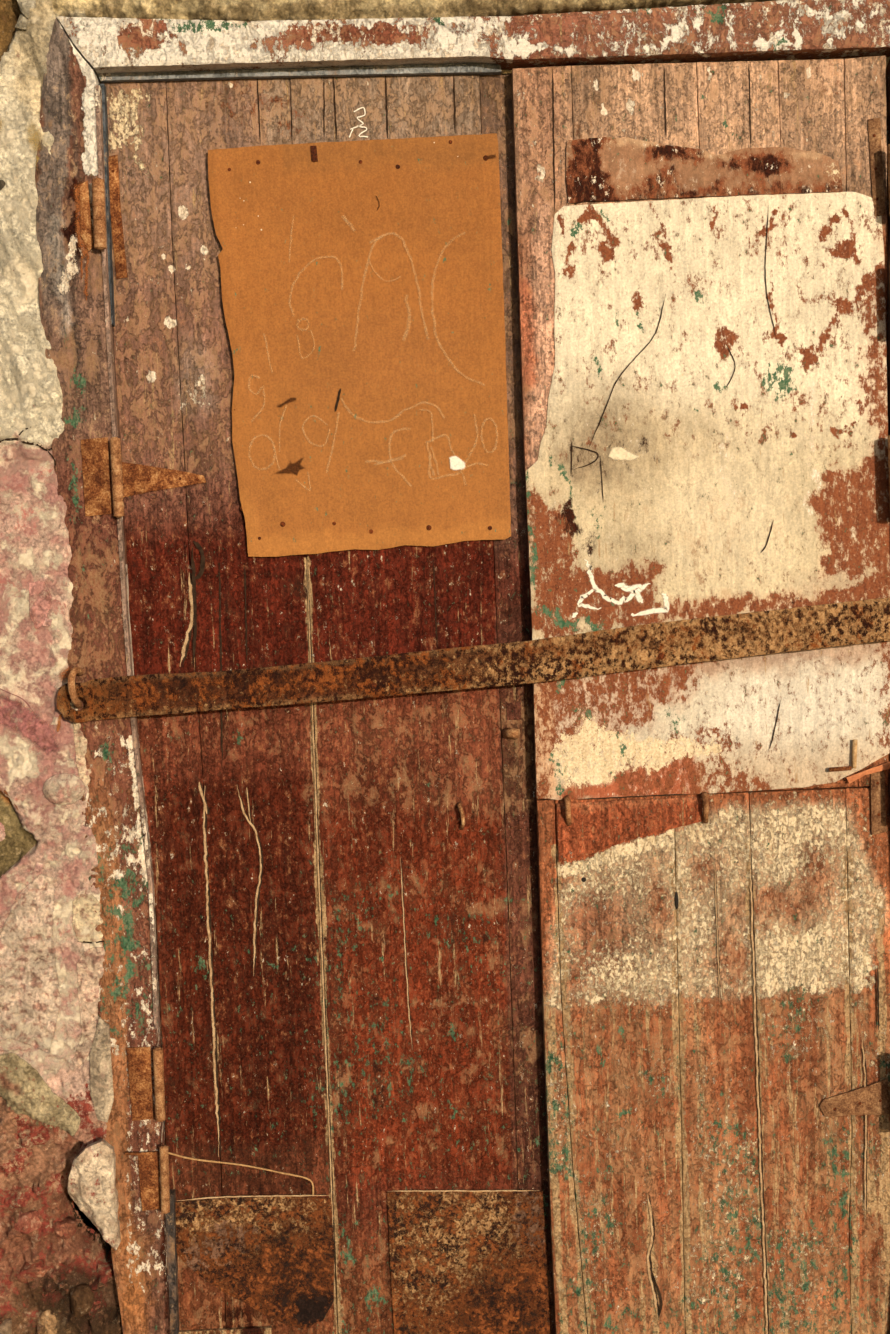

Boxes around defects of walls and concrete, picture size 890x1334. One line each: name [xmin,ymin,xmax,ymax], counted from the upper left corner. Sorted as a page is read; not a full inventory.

spalling [0,792,123,1334]